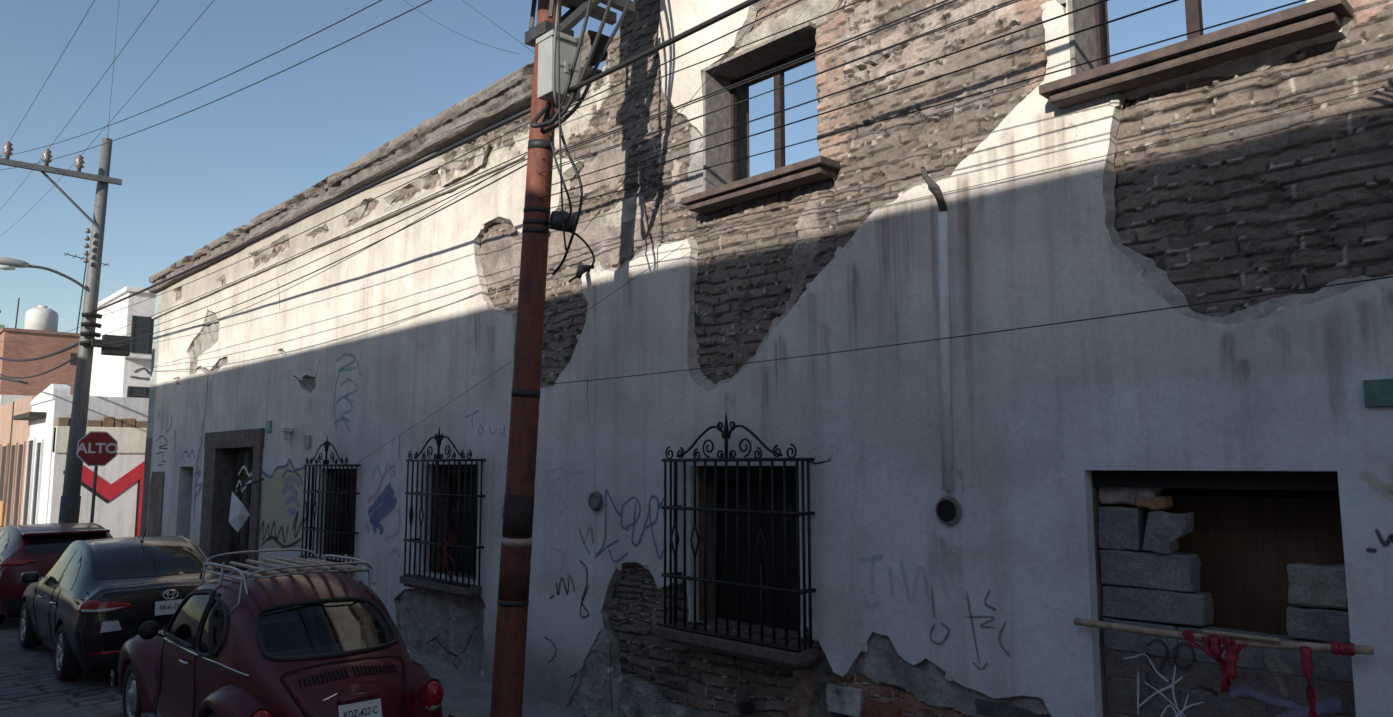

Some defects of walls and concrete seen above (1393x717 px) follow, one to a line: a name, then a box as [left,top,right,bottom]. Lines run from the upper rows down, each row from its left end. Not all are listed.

spalling [306,109,530,242]
spalling [540,0,1066,392]
spalling [1103,0,1393,325]
spalling [187,308,228,375]
spalling [474,217,522,352]
spalling [566,562,1052,717]